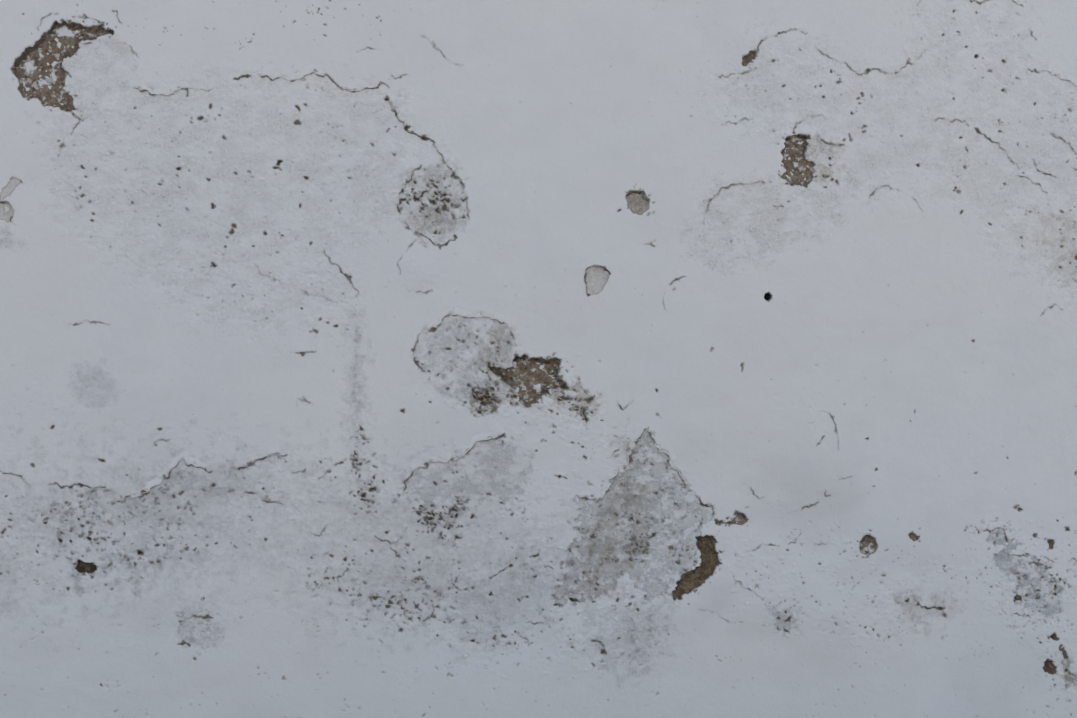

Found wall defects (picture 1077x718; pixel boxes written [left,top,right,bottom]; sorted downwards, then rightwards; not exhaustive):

spalling [11,21,114,111]
crack [134,65,452,170]
spalling [781,134,841,187]
flaking render [0,177,22,222]
spalling [626,191,649,215]
spalling [584,265,611,296]
spalling [488,354,598,407]
crack [56,451,210,502]
peeling [552,427,747,605]
spalling [860,535,878,554]
crack [1048,633,1077,676]